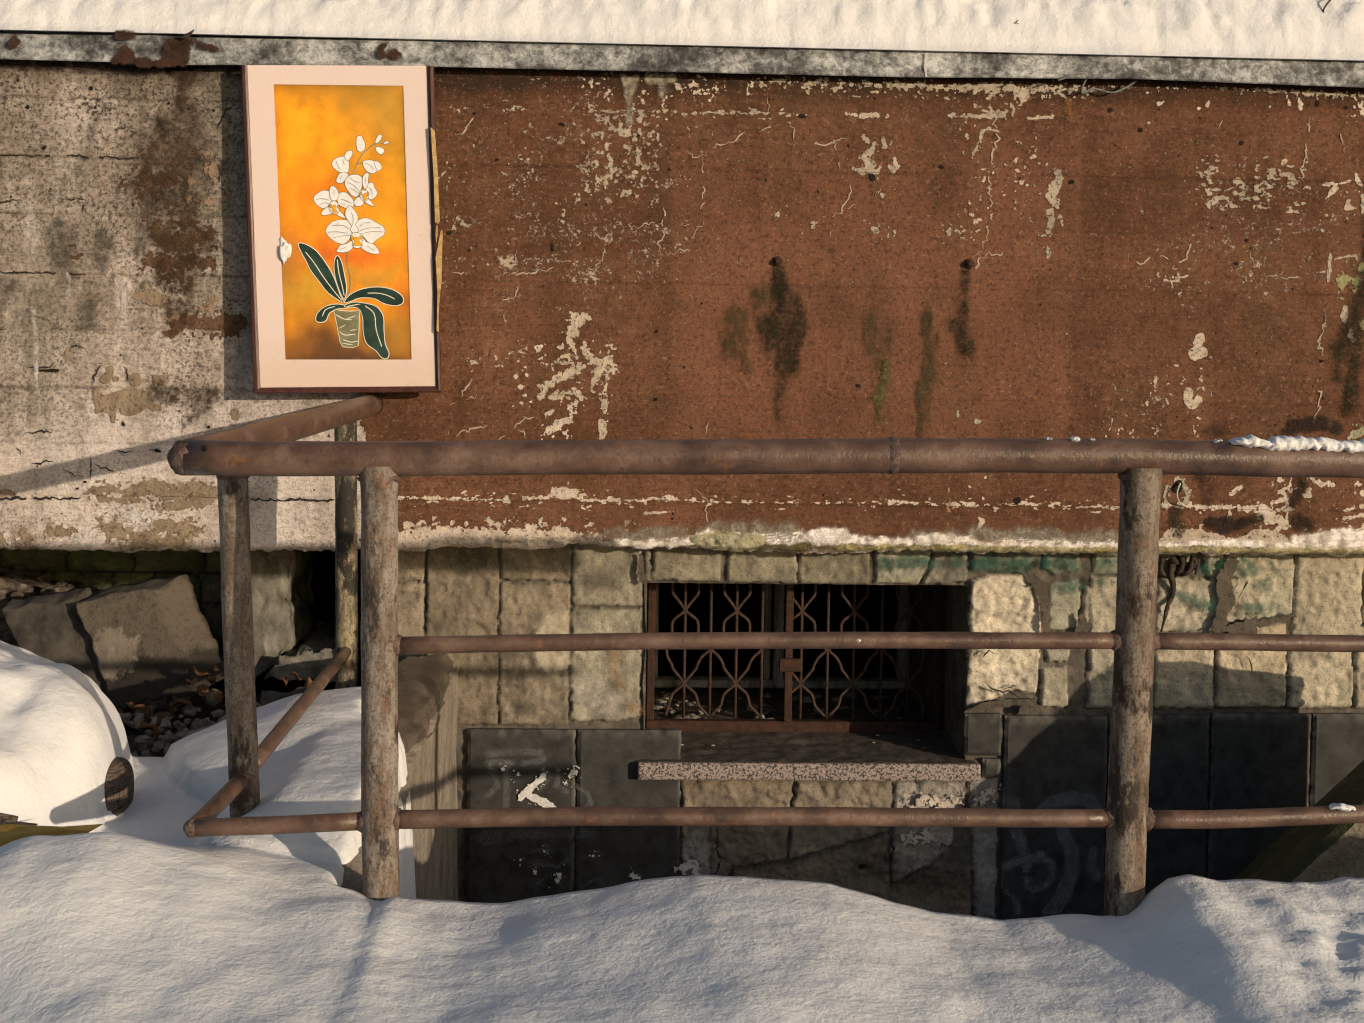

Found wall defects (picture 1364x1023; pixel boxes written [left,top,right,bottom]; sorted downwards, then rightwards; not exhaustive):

corrosion [7,34,21,49]
corrosion [111,30,219,68]
damp [0,59,241,325]
peeling [551,75,1364,259]
spalling [89,365,170,426]
peeling [468,304,620,440]
damp [725,266,808,419]
damp [916,270,975,438]
peeling [1307,248,1364,300]
damp [1331,251,1364,416]
peeling [398,482,799,551]
peeling [815,476,1120,530]